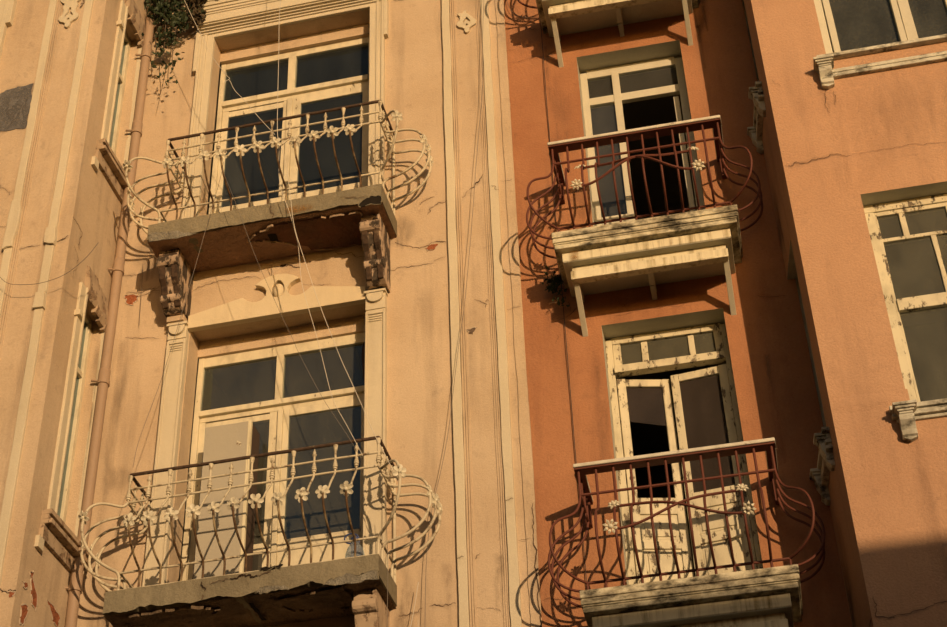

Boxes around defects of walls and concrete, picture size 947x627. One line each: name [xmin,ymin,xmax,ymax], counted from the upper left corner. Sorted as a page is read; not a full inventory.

peeling [248,195,383,250]